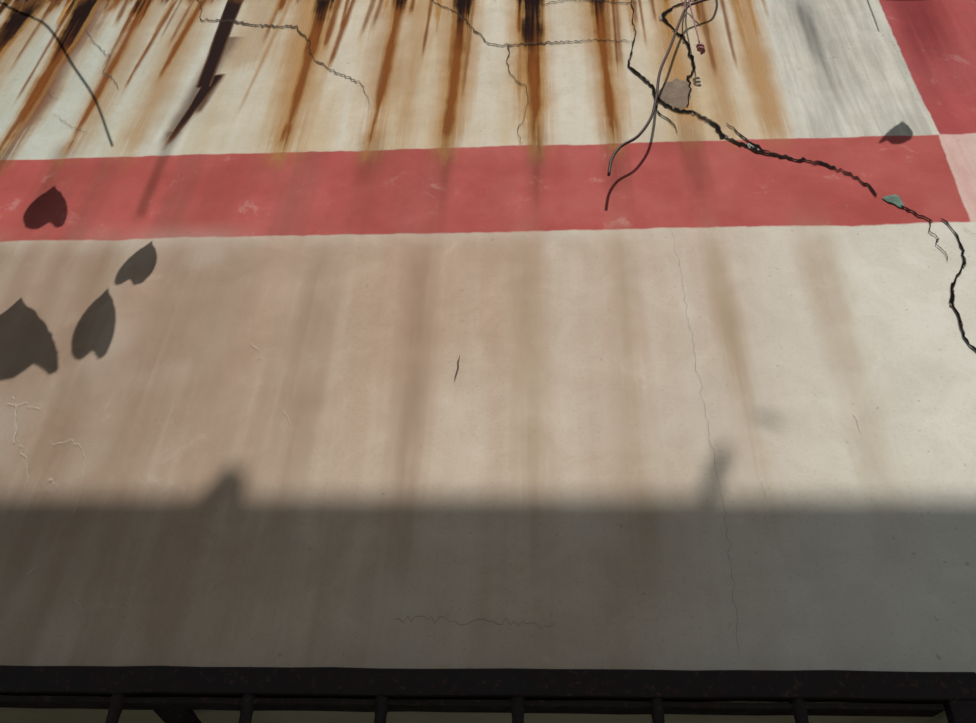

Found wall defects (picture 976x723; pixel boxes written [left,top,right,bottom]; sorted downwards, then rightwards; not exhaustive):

corrosion [0,0,212,151]
corrosion [167,0,243,143]
corrosion [278,0,355,145]
corrosion [364,0,415,144]
corrosion [423,0,474,139]
corrosion [516,0,545,153]
corrosion [587,0,618,134]
crack [432,0,877,196]
corrosion [627,0,686,81]
corrosion [695,0,713,62]
corrosion [721,0,779,125]
crack [901,205,976,351]